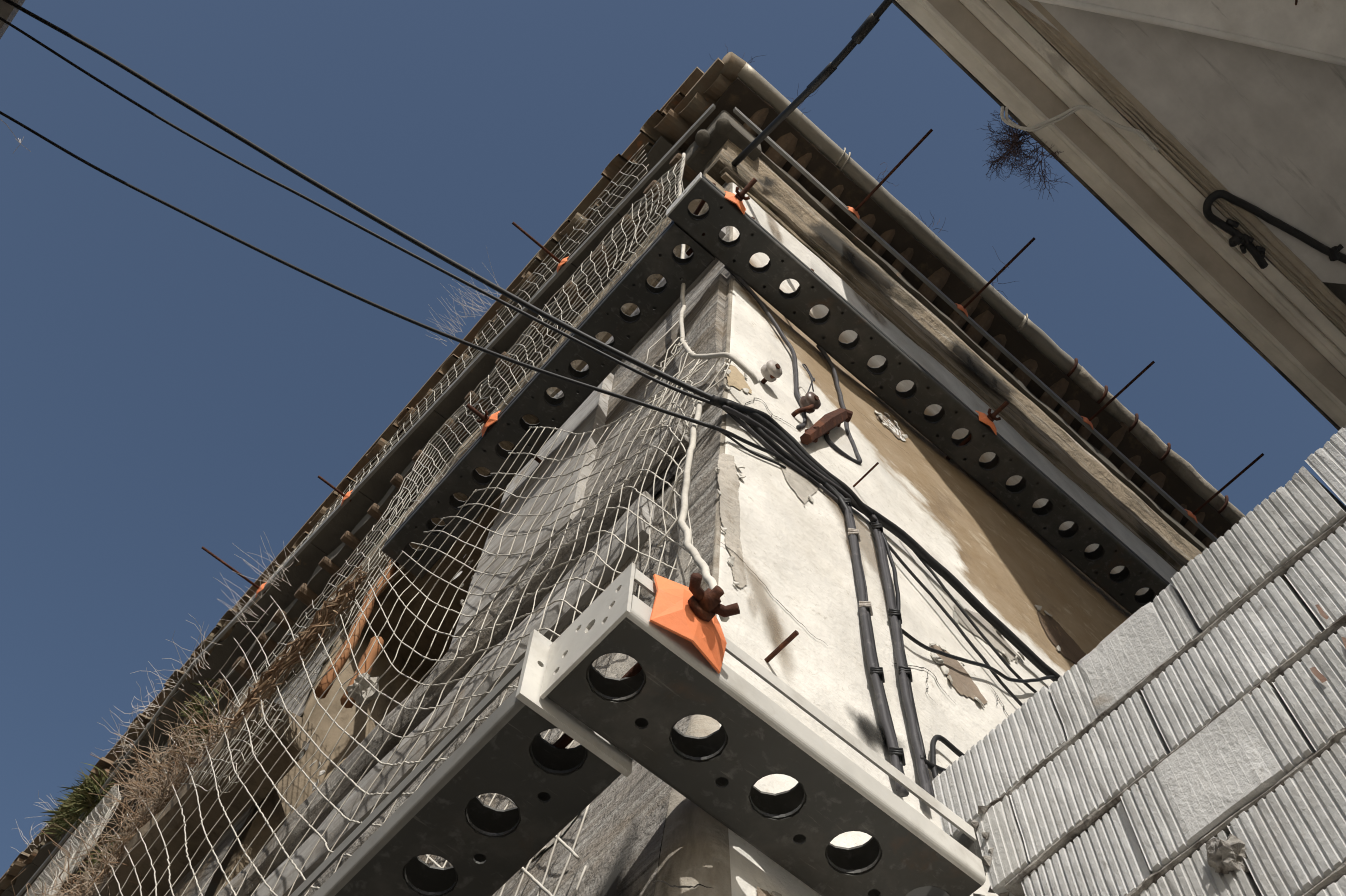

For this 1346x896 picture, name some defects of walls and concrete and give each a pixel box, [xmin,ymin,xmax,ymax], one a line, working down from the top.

spalling [723,358,752,394]
spalling [715,453,747,588]
peeling [1035,605,1087,665]
peeling [929,641,987,708]
peeling [757,887,782,896]